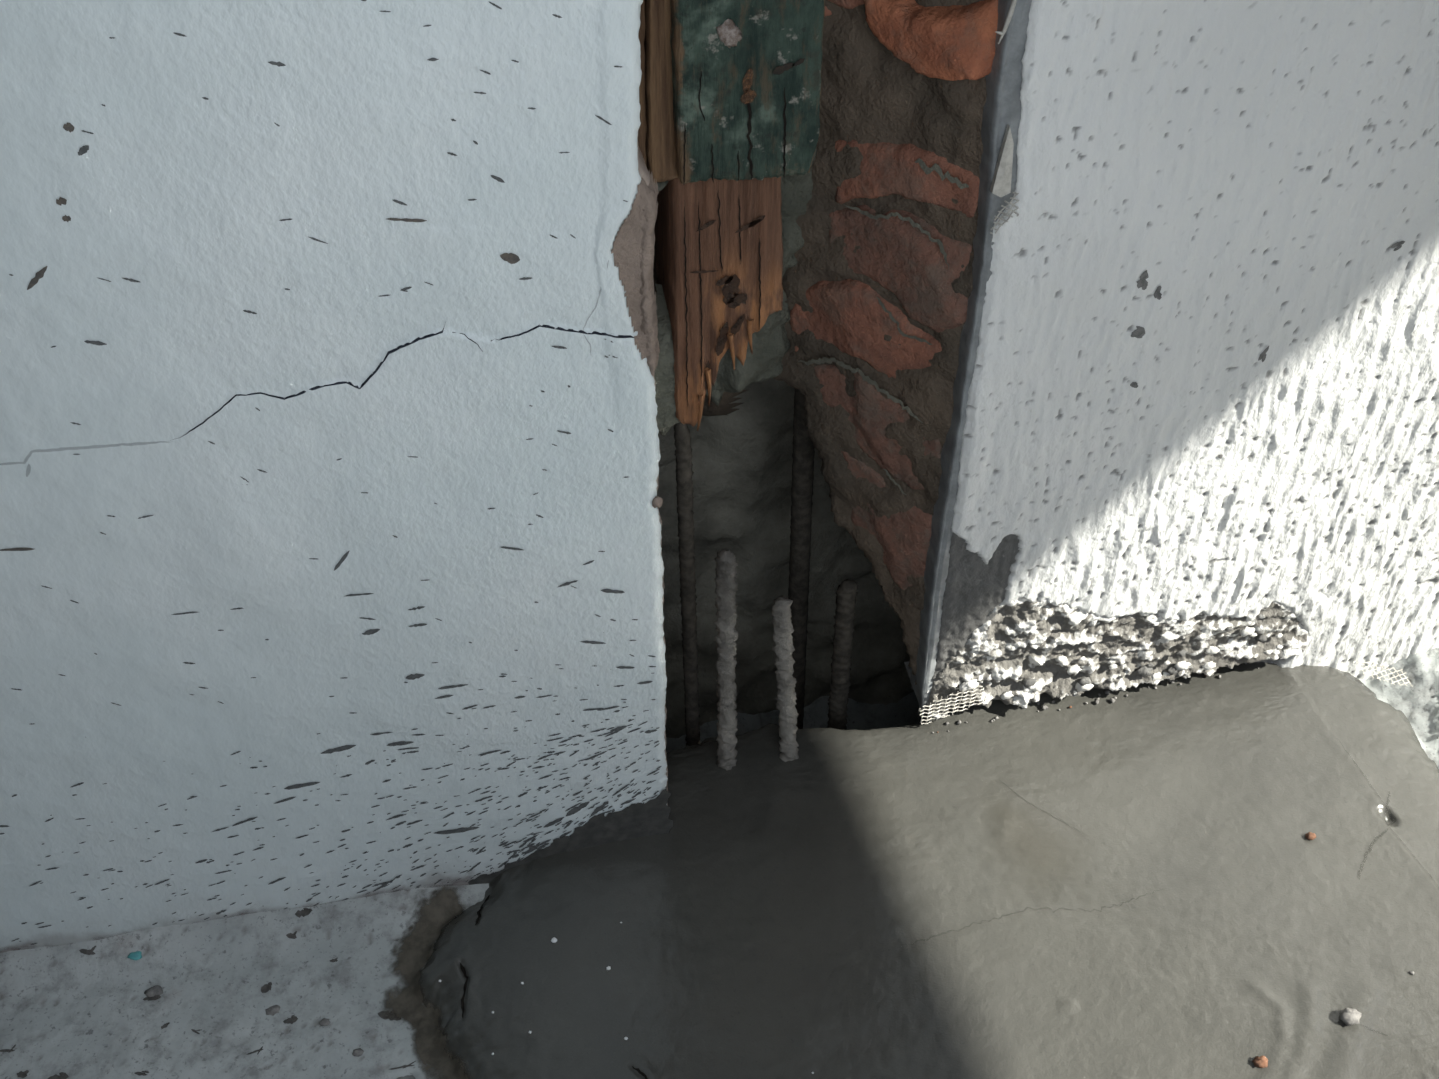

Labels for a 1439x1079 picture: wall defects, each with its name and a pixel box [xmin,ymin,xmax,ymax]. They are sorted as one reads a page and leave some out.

flaking render [611,170,660,376]
crack [170,322,634,441]
spalling [652,422,739,770]
spalling [771,388,815,762]
spalling [827,579,858,730]
spalling [923,532,1310,719]